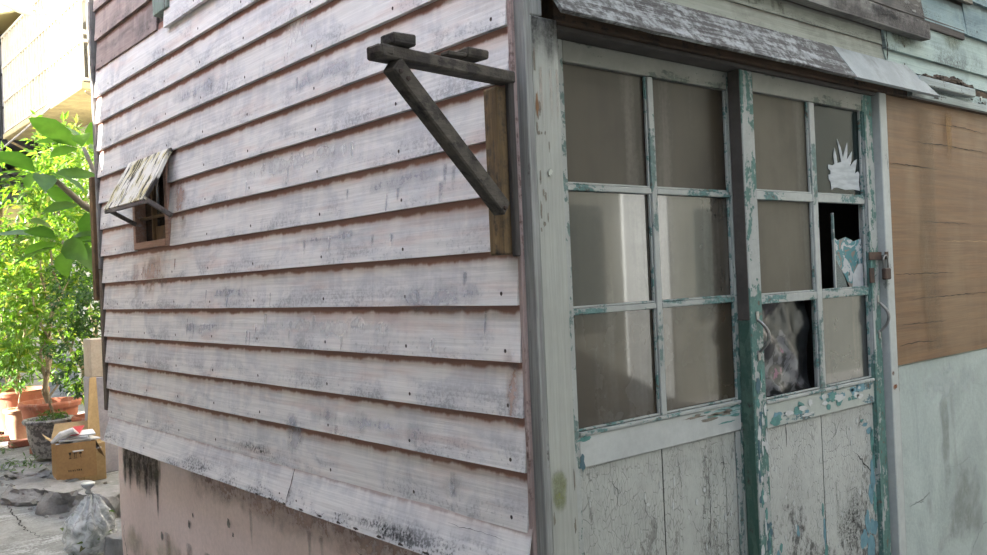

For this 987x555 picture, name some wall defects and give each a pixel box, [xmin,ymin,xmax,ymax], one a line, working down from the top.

peeling [685,404,742,425]
leakage [123,448,159,507]
leakage [206,477,421,555]
crack [689,456,733,546]
peeling [756,369,866,555]
peeling [860,419,878,555]